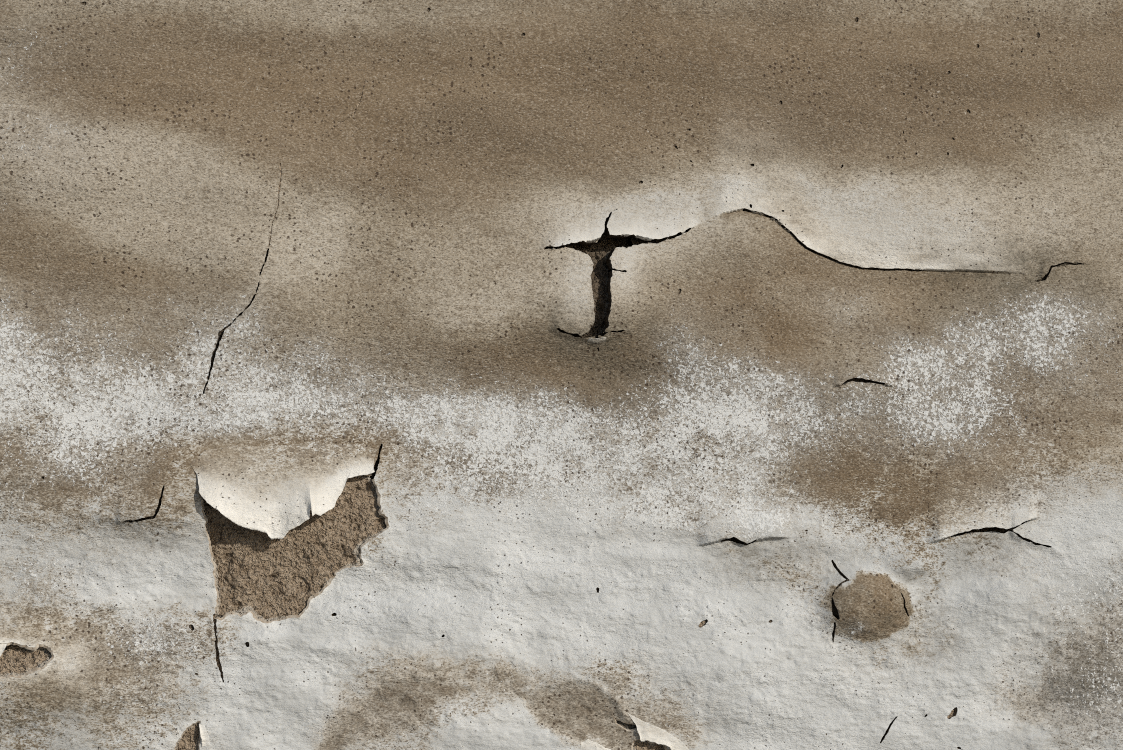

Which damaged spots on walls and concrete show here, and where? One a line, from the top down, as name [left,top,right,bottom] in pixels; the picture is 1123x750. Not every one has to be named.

crack [203,163,282,394]
water stain [0,0,1123,560]
crack [1036,262,1082,282]
peeling [0,295,1092,682]
crack [949,520,1052,548]
peeling [175,721,210,750]
peeling [314,653,689,750]
water stain [1005,580,1123,750]